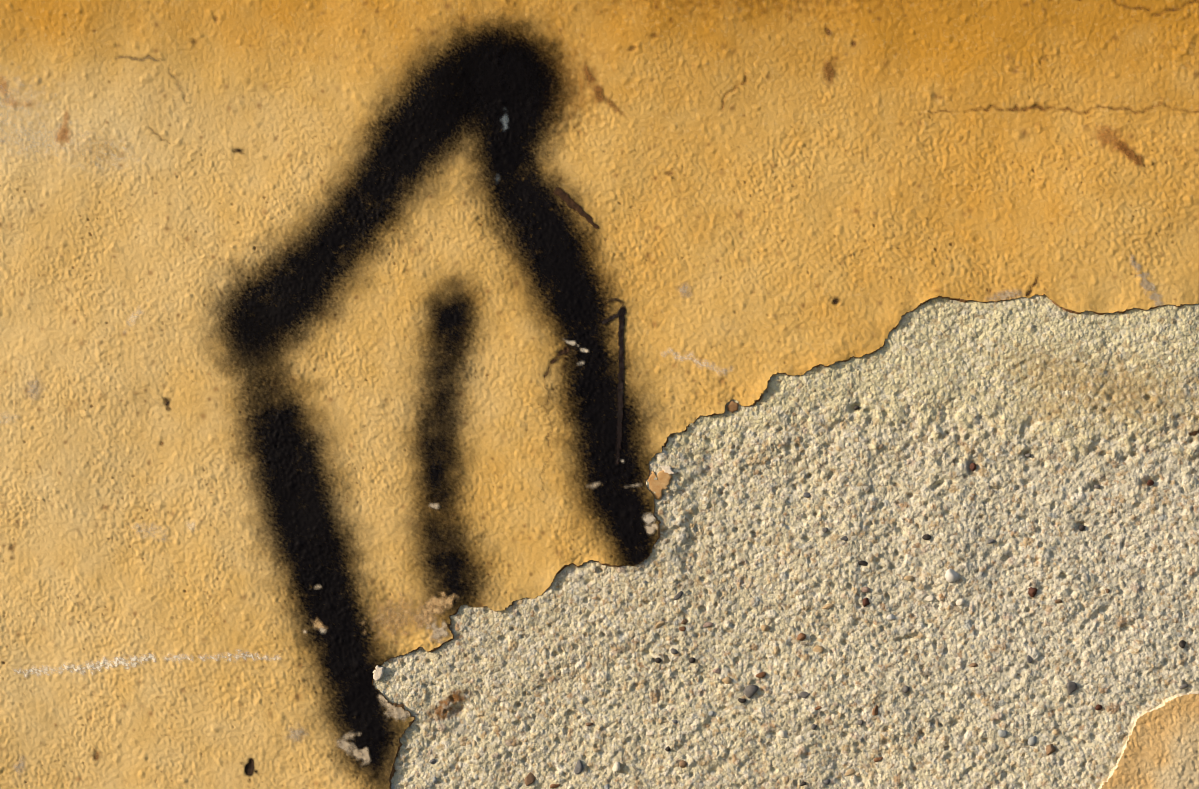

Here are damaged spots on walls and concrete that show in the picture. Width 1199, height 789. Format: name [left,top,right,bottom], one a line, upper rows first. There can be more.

spalling [372,294,1199,789]